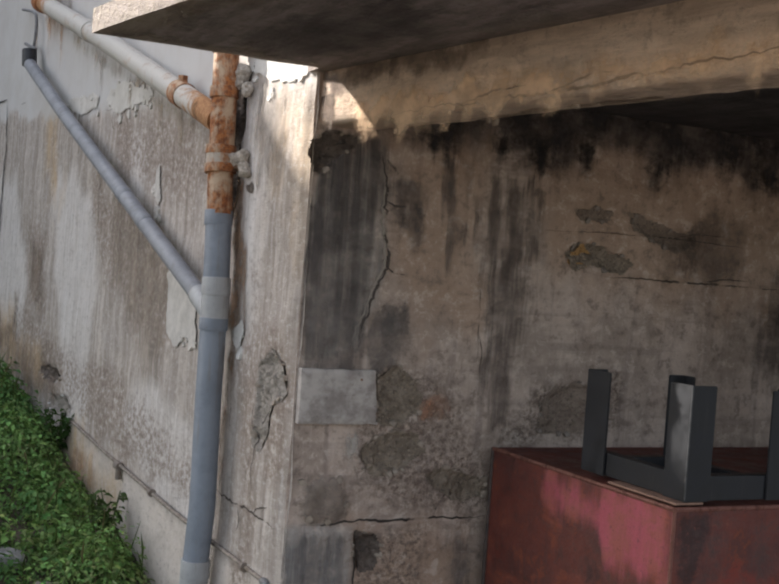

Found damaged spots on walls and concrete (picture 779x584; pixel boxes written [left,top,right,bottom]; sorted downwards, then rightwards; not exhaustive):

peeling [67,81,154,124]
crack [0,100,8,227]
spalling [308,129,362,174]
crack [382,156,405,211]
leakage [579,144,595,171]
spalling [628,211,697,254]
spalling [565,242,633,275]
peeling [166,271,197,351]
crack [358,234,404,348]
spalling [250,348,288,453]
crack [320,495,486,526]
spalling [351,530,383,573]